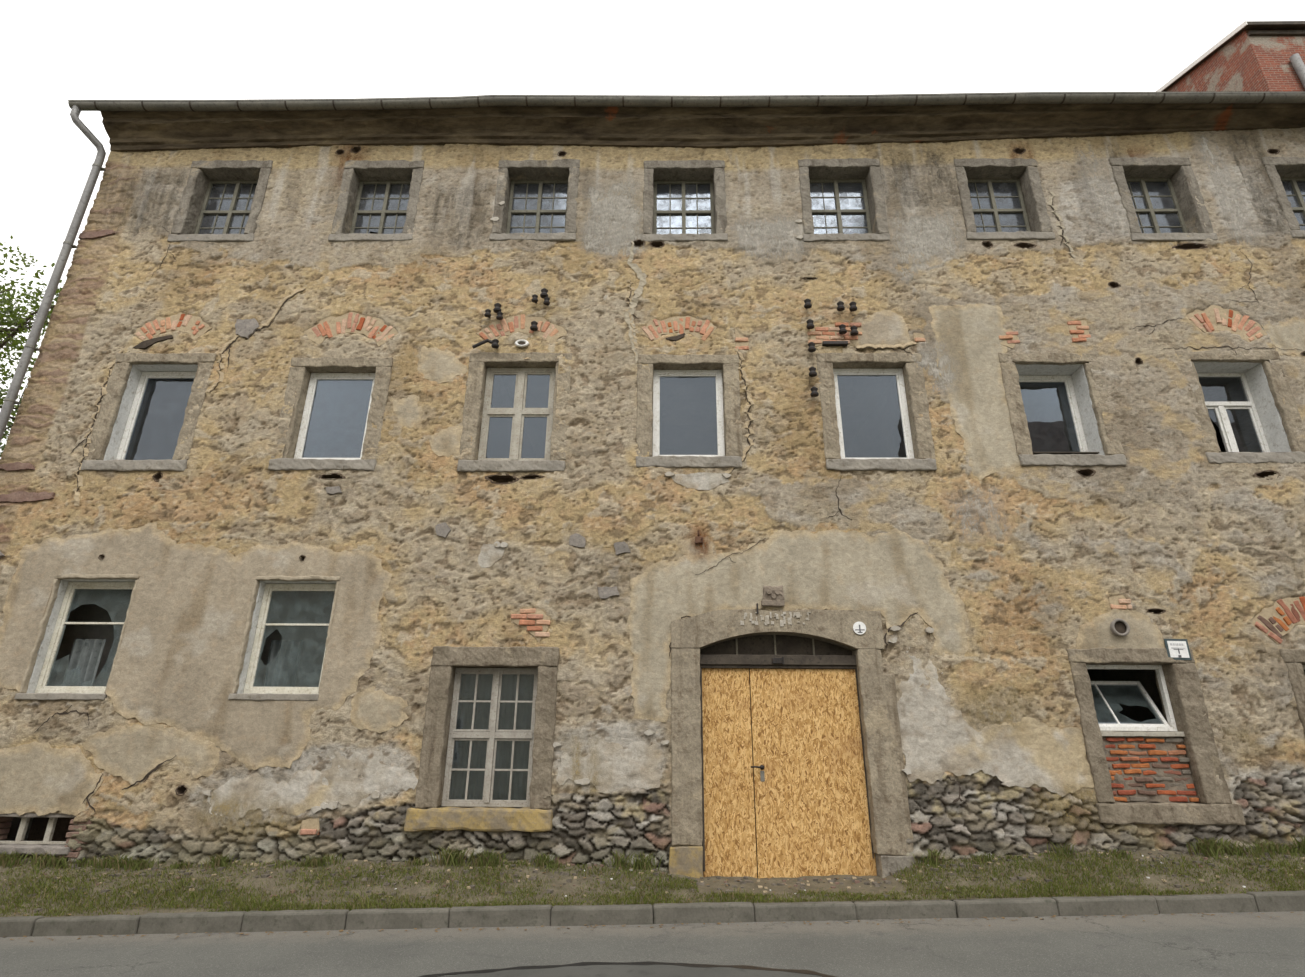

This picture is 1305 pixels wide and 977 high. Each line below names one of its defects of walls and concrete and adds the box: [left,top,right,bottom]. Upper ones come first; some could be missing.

flaking render [78,229,116,239]
flaking render [135,314,205,341]
flaking render [312,313,394,342]
crack [1133,318,1300,355]
spalling [485,474,545,484]
spalling [1254,470,1281,480]
crack [828,477,852,520]
crack [695,538,766,575]
flaking render [1255,597,1305,644]
flaking render [888,625,1094,797]
crack [83,757,174,812]
flaking render [175,749,418,835]